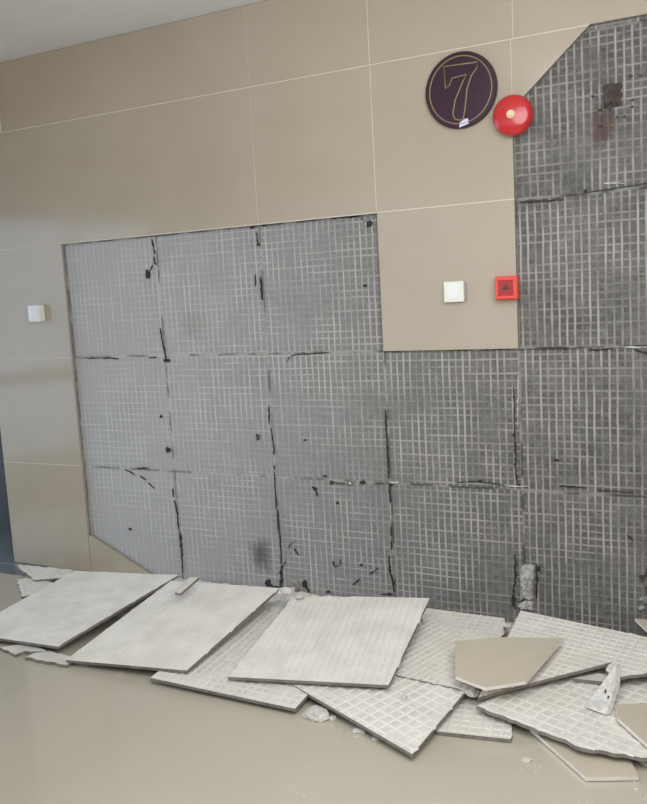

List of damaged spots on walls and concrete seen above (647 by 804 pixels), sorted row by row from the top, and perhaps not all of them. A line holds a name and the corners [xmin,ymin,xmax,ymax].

spalling [591,74,643,127]
spalling [175,577,199,596]